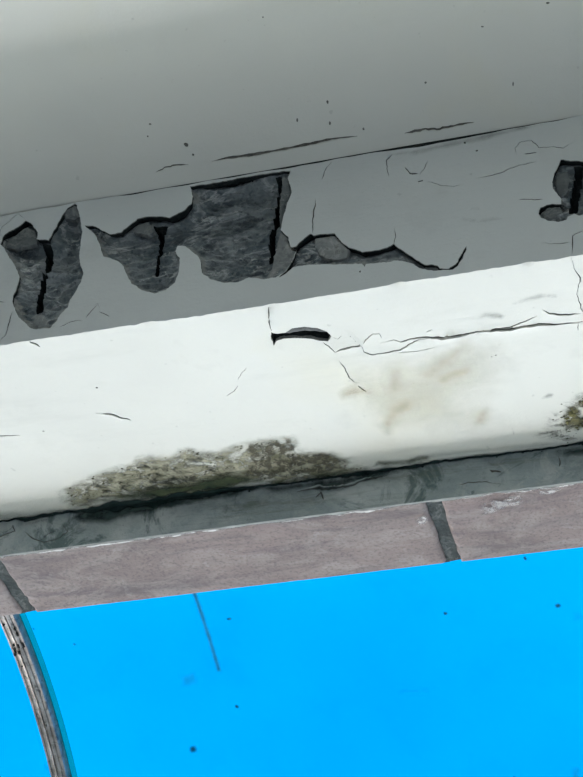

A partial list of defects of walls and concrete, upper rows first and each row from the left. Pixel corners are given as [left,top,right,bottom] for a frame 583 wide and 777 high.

crack [120,118,571,196]
spalling [539,159,583,222]
spalling [1,171,467,329]
spalling [271,327,331,345]
crack [323,231,583,392]
damp [0,440,583,522]